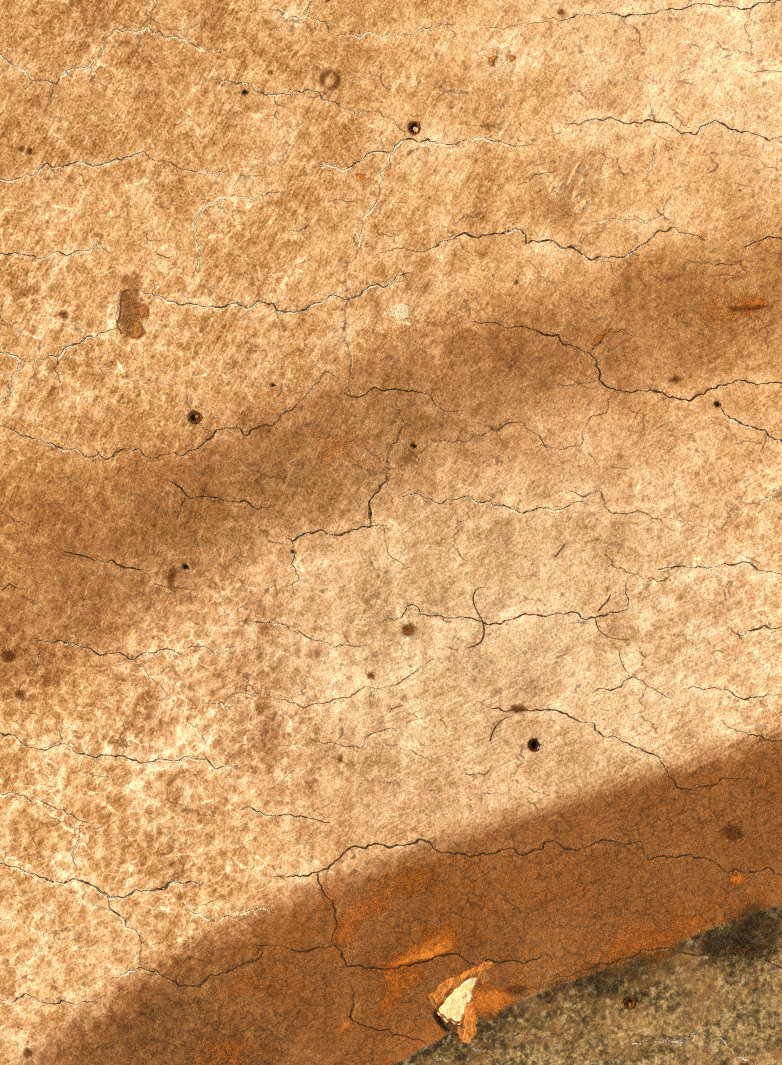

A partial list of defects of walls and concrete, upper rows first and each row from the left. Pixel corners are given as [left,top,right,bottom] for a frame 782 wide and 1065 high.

crack [487,0,779,37]
crack [0,78,782,596]
crack [379,551,782,626]
crack [0,659,432,770]
crack [476,701,758,791]
crack [592,646,779,700]
water stain [135,899,336,1065]
crack [0,791,782,1065]
rust [384,927,455,1004]
spalling [426,959,495,1044]
rust [473,990,508,1010]
water stain [323,749,782,1065]